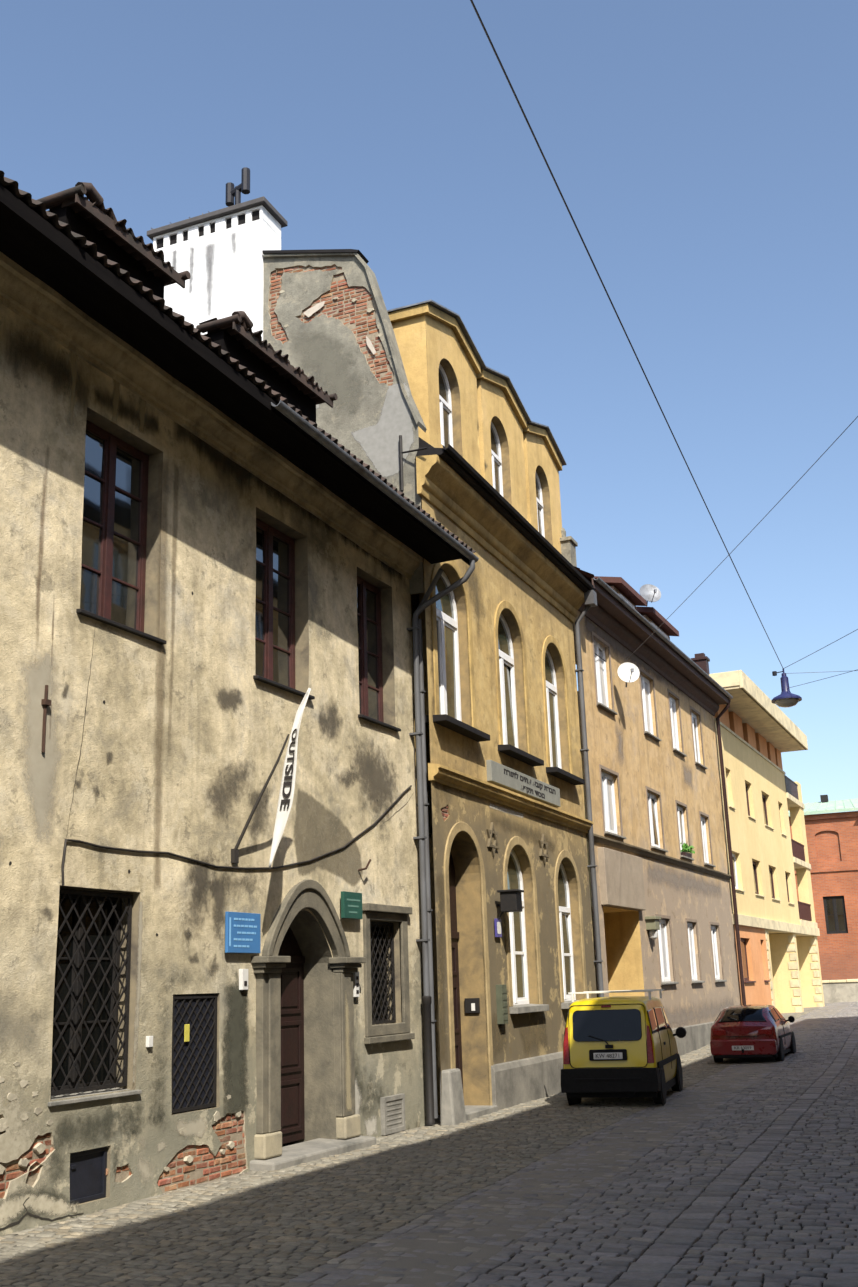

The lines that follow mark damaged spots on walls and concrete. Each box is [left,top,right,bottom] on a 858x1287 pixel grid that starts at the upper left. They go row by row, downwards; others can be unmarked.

flaking render [269,265,394,386]
peeling [0,1061,78,1226]
flaking render [106,1095,246,1193]